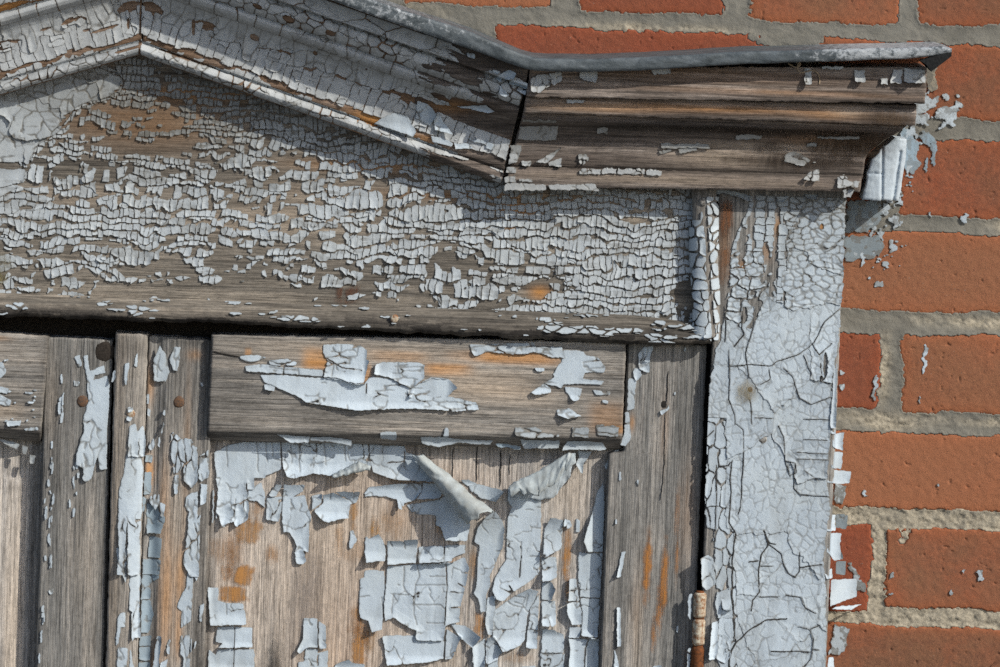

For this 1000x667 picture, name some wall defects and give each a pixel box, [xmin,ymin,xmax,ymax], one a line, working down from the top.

peeling [881,68,926,85]
peeling [0,0,720,343]
peeling [784,135,860,181]
peeling [0,359,38,431]
peeling [58,353,138,517]
peeling [153,346,181,382]
peeling [240,344,479,412]
peeling [470,334,611,404]
peeling [596,346,654,446]
peeling [701,174,861,667]
crack [706,306,841,667]
peeling [116,407,617,667]